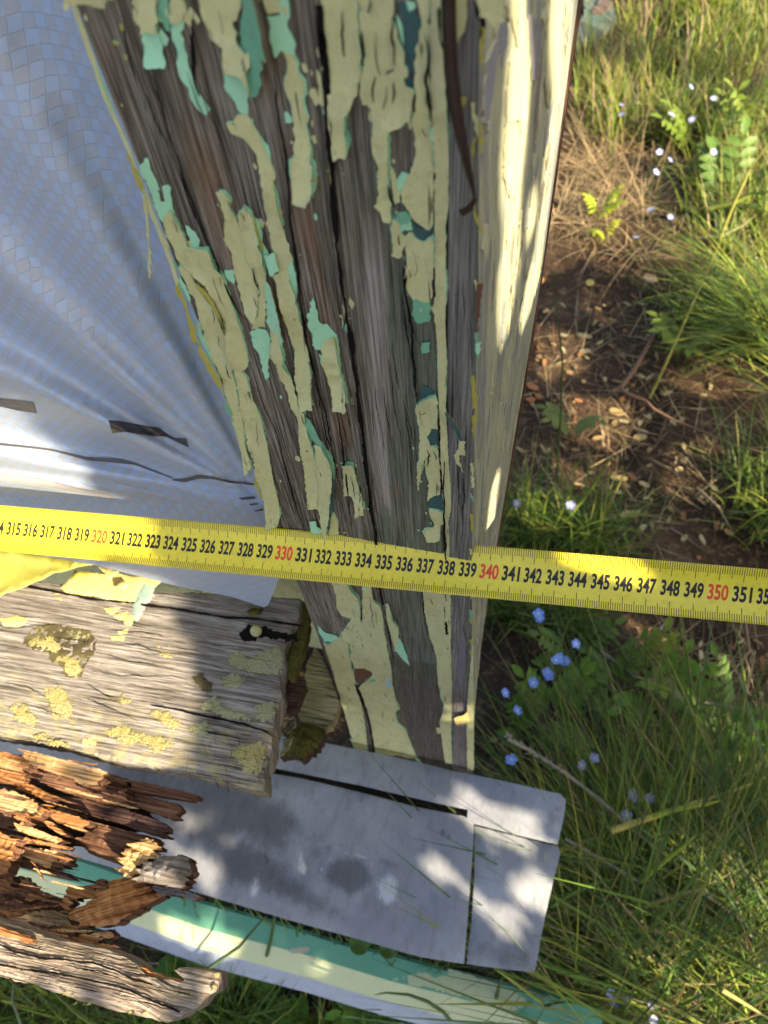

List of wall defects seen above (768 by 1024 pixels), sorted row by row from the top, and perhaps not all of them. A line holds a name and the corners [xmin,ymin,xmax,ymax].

peeling [63,0,567,558]
peeling [317,583,422,763]
peeling [423,592,487,771]